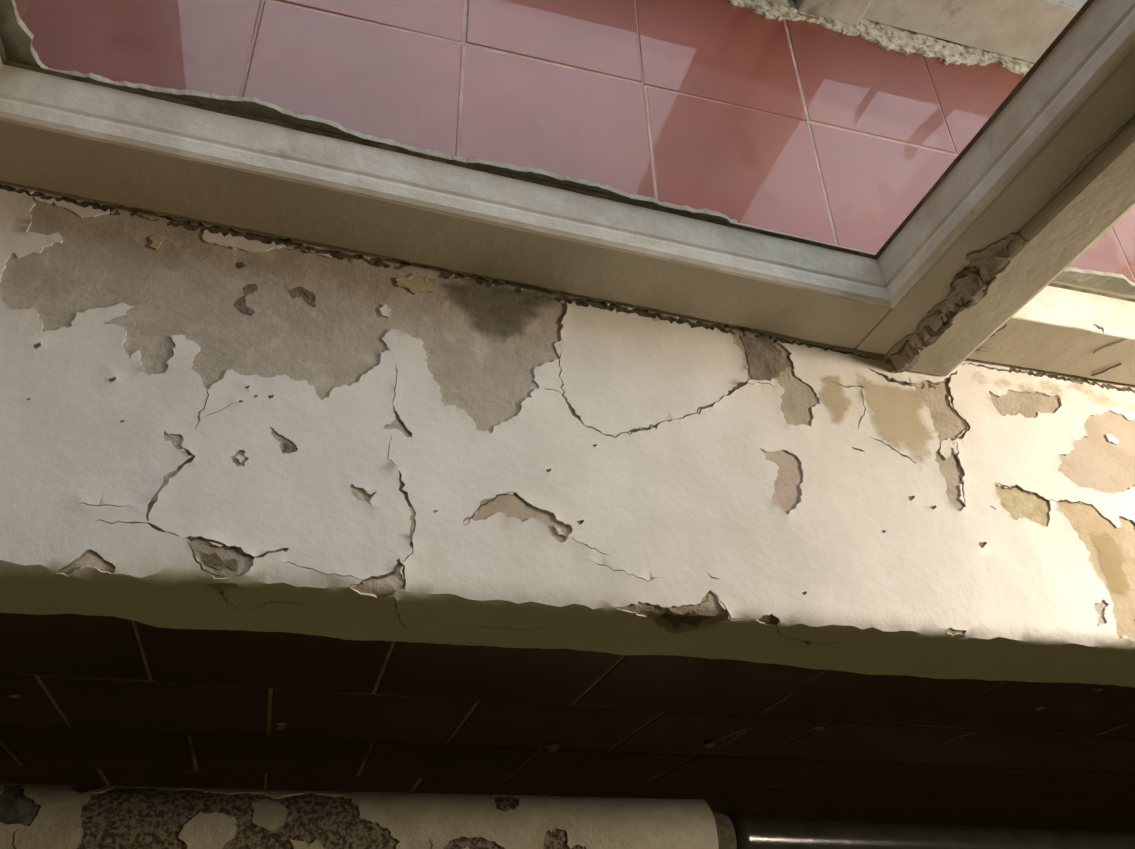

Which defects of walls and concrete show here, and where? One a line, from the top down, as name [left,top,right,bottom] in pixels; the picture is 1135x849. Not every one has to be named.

peeling [0,198,567,434]
crack [0,184,1135,461]
crack [86,392,214,536]
peeling [383,366,412,459]
crack [399,472,416,566]
peeling [466,492,583,541]
spalling [616,574,732,632]
peeling [725,326,819,426]
peeling [761,449,803,514]
peeling [992,485,1135,641]
peeling [1058,411,1135,494]
peeling [77,788,400,849]